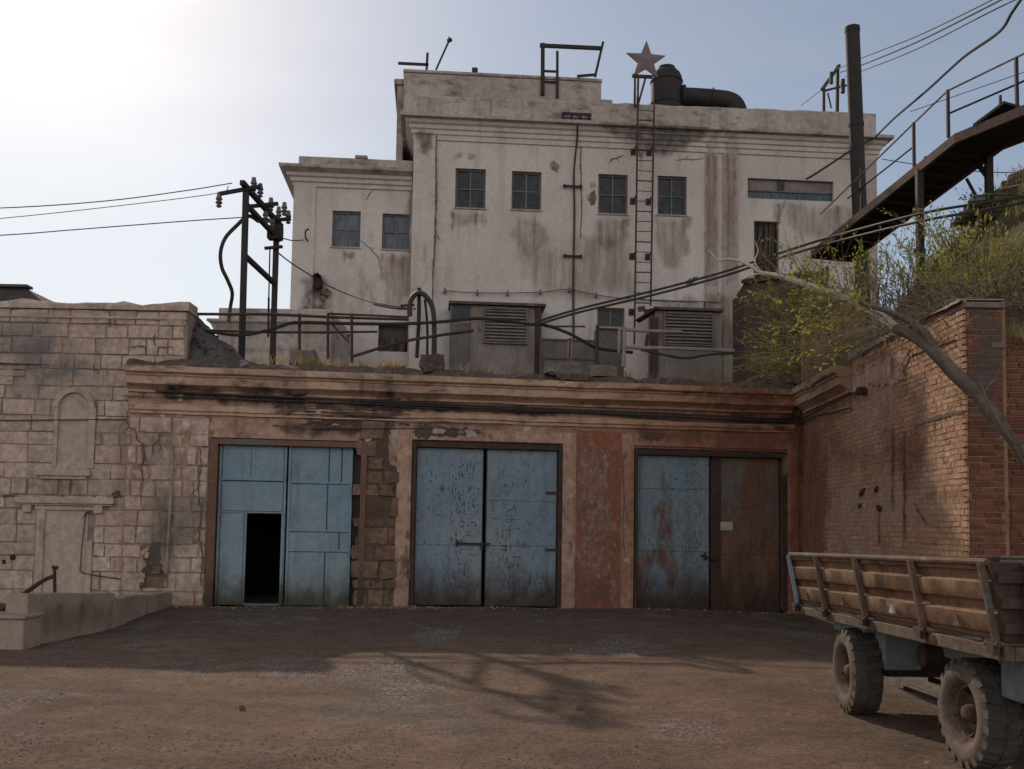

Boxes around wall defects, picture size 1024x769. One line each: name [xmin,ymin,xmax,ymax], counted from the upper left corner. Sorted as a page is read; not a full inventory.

crack [120,392,163,482]
spalling [273,390,481,606]
spalling [138,541,168,589]